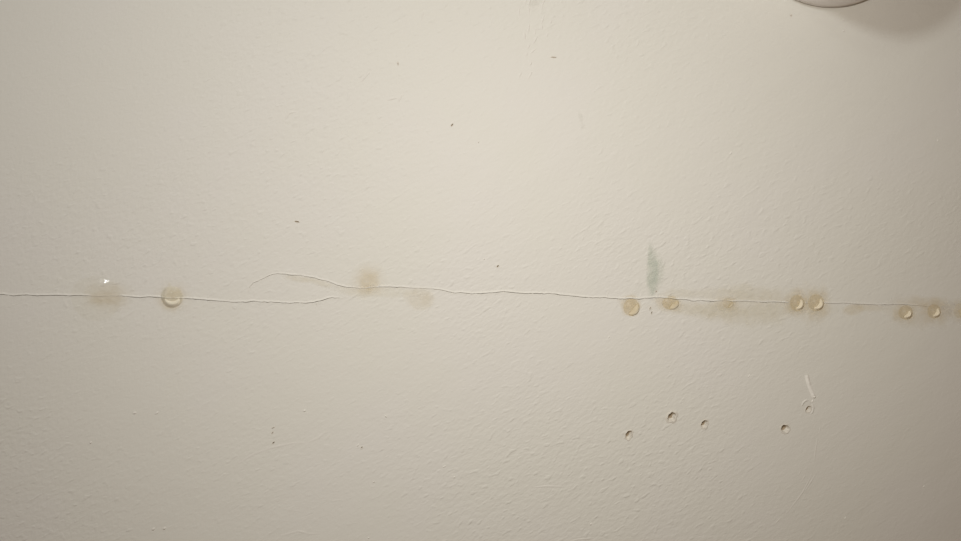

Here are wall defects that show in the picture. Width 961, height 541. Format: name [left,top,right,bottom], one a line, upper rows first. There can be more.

crack [0,271,960,312]